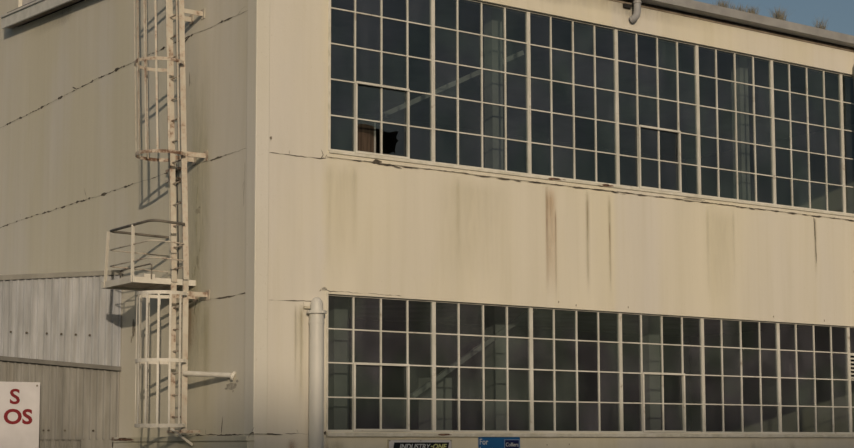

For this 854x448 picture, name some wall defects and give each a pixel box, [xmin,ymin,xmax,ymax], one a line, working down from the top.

crack [1,173,168,228]
crack [269,150,854,264]